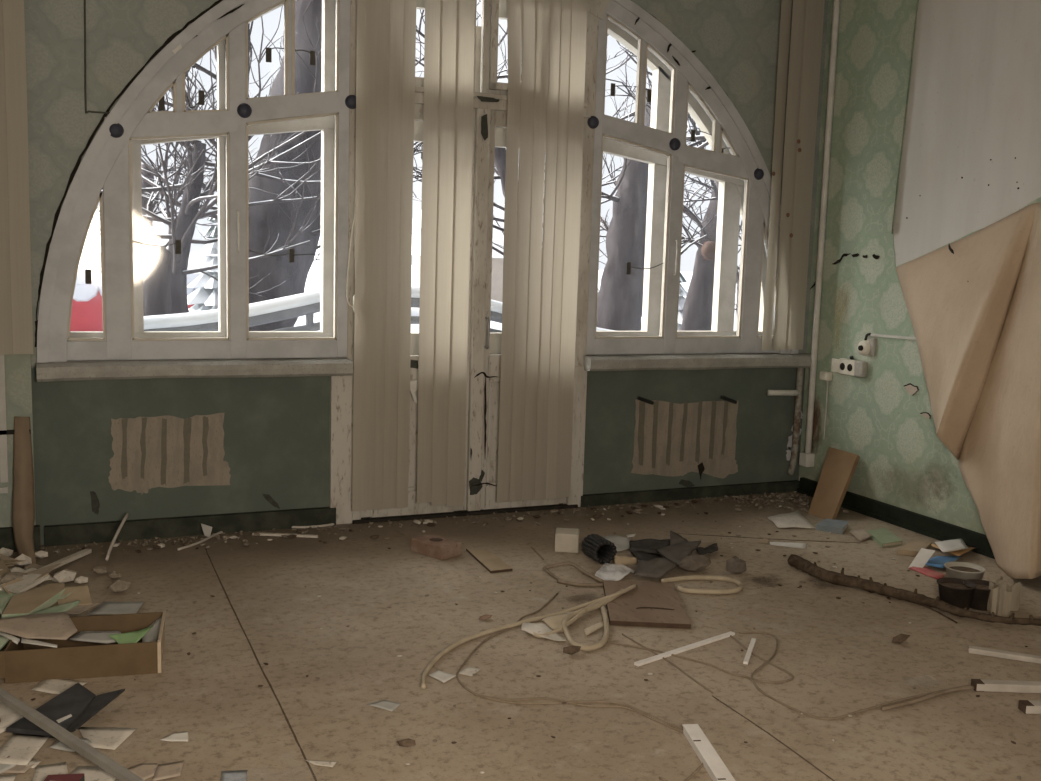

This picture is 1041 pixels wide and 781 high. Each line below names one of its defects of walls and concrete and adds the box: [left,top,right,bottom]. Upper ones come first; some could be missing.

flaking render [108,413,231,494]
flaking render [631,399,738,487]